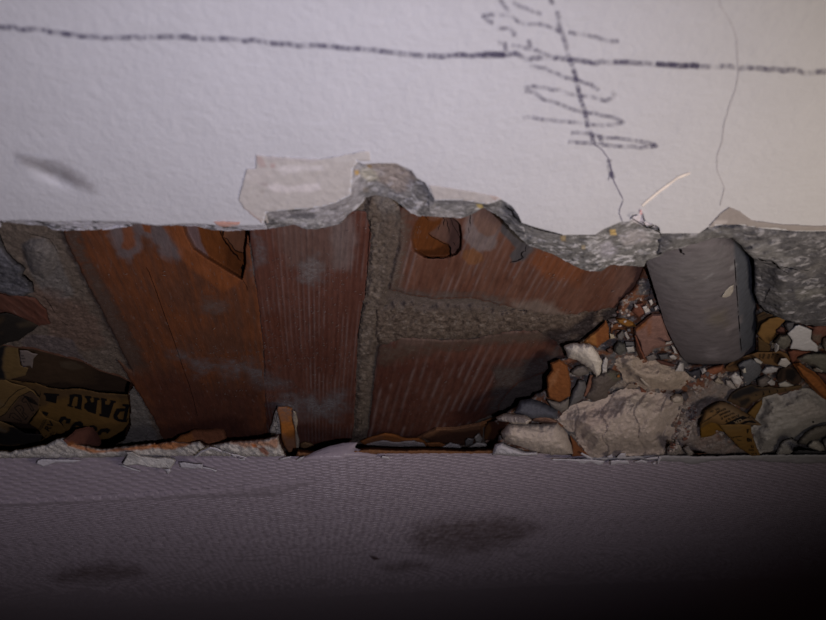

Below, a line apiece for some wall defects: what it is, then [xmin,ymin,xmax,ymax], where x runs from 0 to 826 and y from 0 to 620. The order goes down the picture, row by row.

crack [594,144,624,222]
peeling [0,151,663,271]
peeling [708,207,826,231]
flaking render [609,331,635,353]
flaking render [665,341,684,372]
flaking render [725,368,746,389]
flaking render [754,343,793,387]
peeling [787,324,818,352]